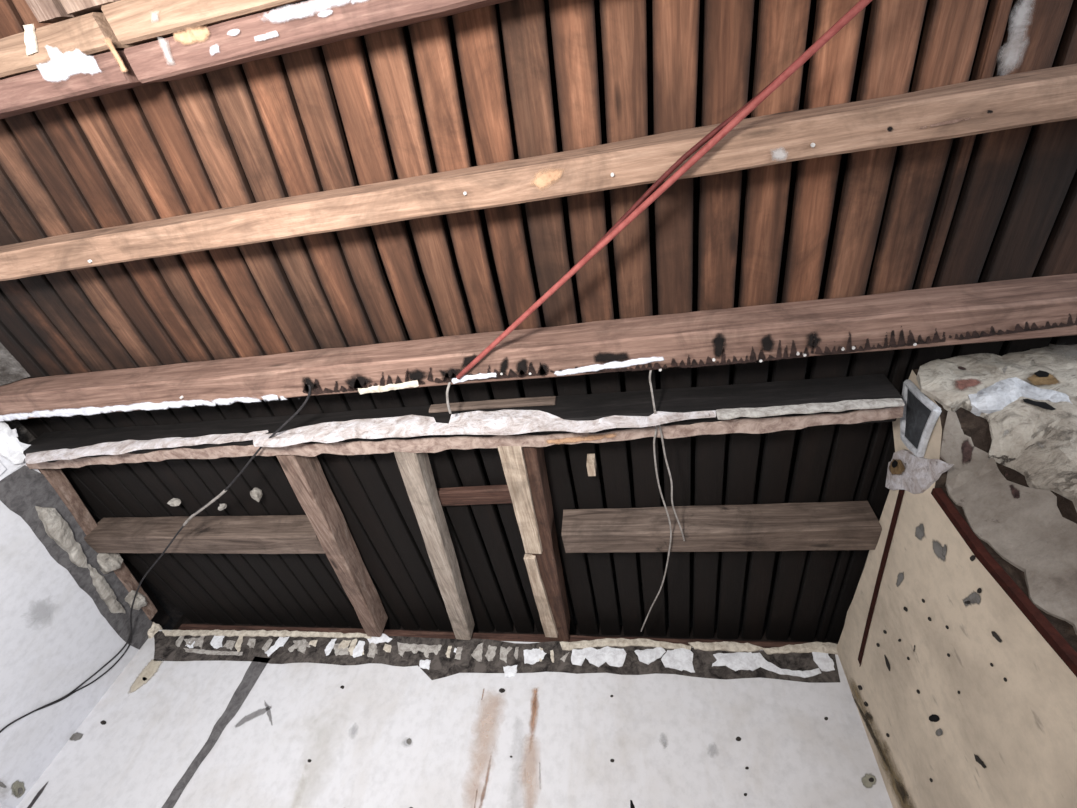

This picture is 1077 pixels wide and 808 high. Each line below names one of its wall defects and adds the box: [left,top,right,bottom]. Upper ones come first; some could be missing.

flaking render [885,343,1077,635]
peeling [0,421,840,693]
crack [236,702,272,727]
damp [851,684,914,808]
flaking render [929,714,943,736]